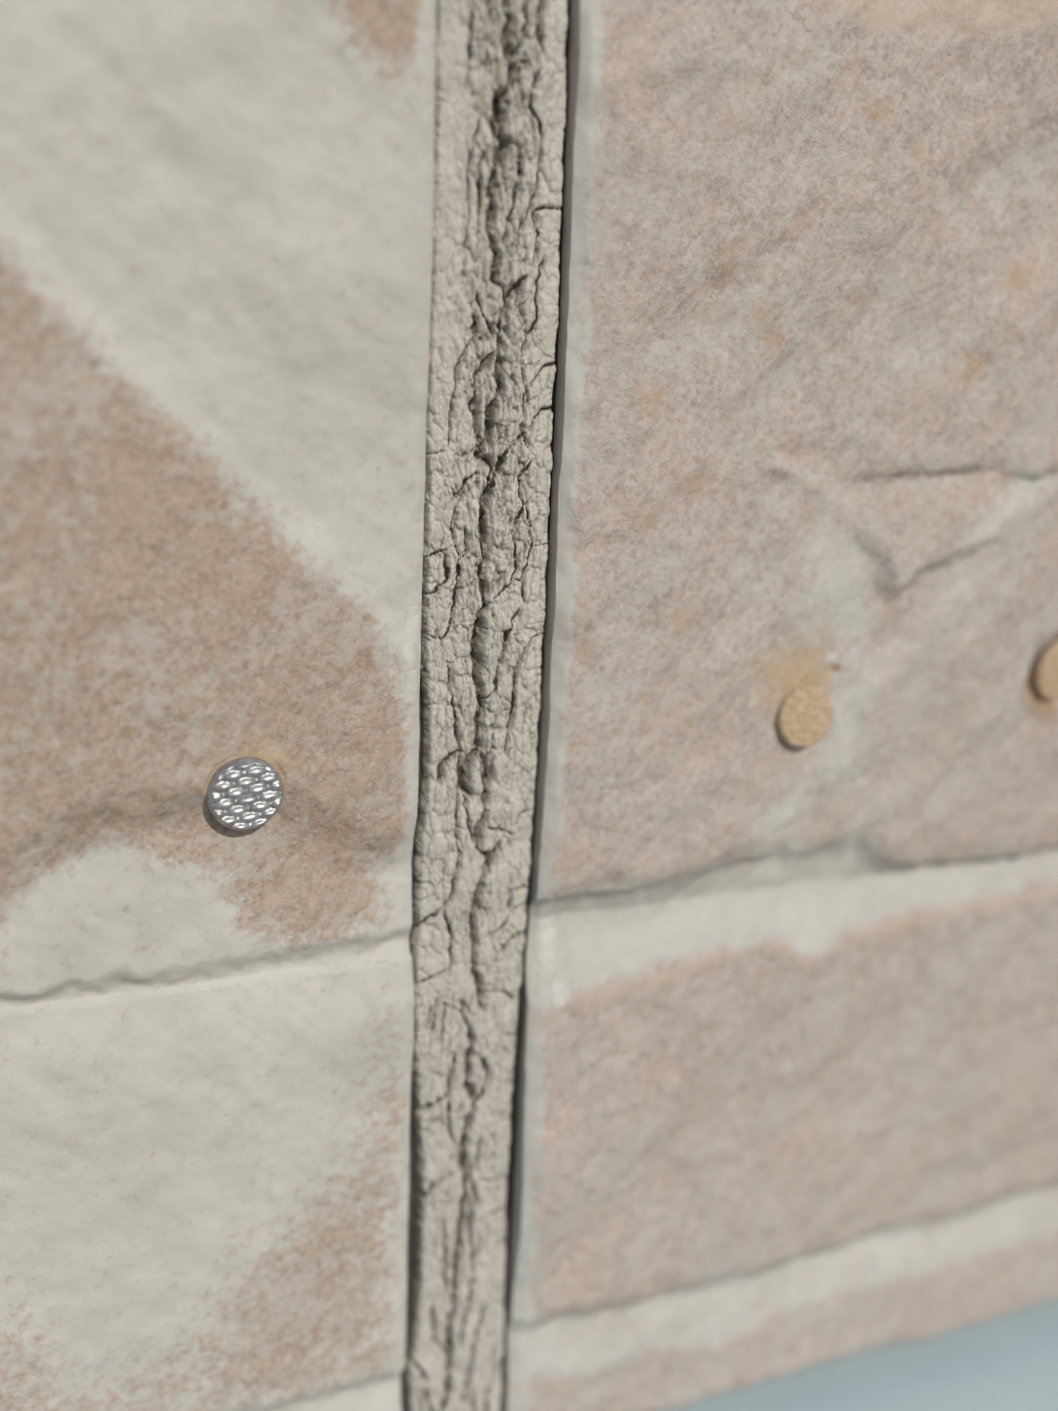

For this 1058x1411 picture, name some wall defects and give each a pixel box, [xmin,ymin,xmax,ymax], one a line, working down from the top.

crack [407,0,559,1411]